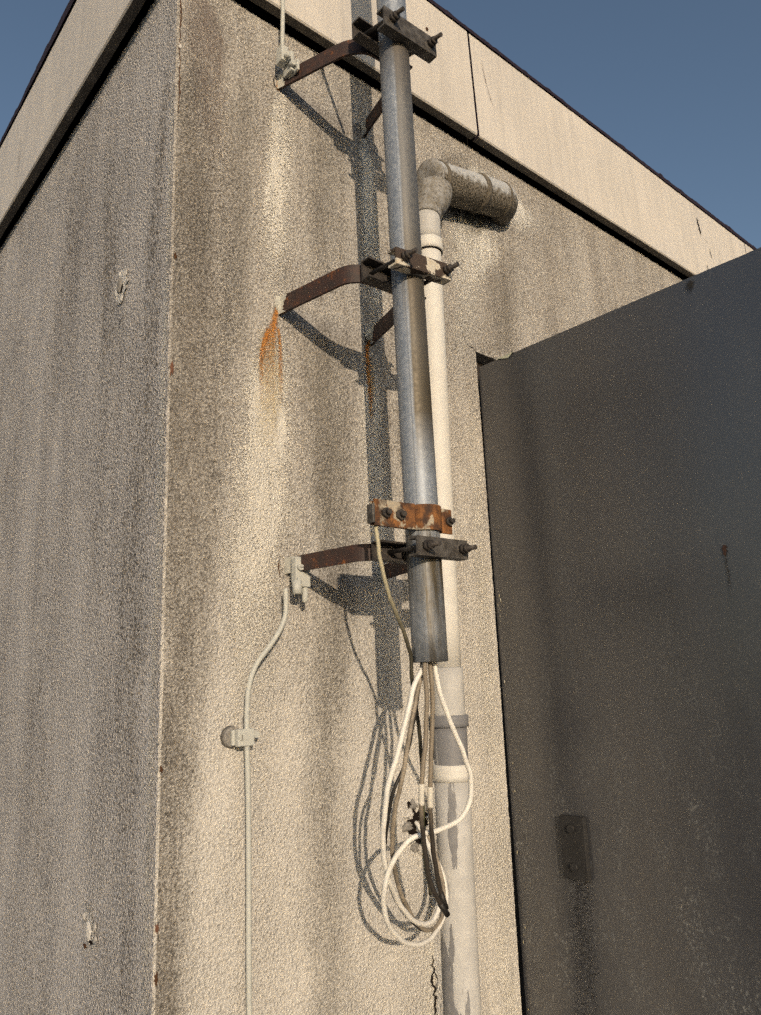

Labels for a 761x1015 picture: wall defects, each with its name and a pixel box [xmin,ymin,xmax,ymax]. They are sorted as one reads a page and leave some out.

corrosion [256,308,283,446]
corrosion [365,341,375,418]
crack [430,956,438,1015]